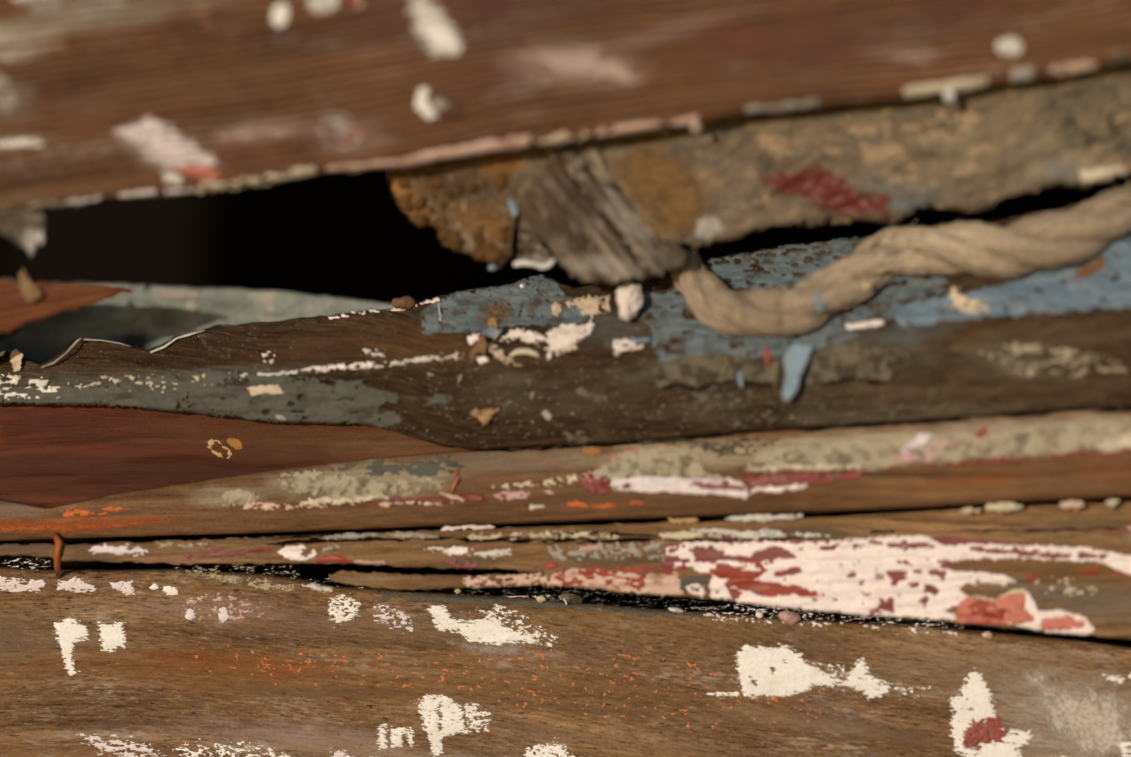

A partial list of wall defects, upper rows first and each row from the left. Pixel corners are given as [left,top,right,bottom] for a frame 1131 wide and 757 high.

peeling [271,3,289,28]
peeling [307,0,364,14]
peeling [406,0,466,57]
peeling [414,87,449,120]
peeling [695,216,726,241]
peeling [0,274,611,429]
peeling [220,232,1131,511]
peeling [60,506,124,518]
peeling [959,502,1023,514]
peeling [0,558,97,593]
peeling [88,514,1131,651]
peeling [53,617,127,677]